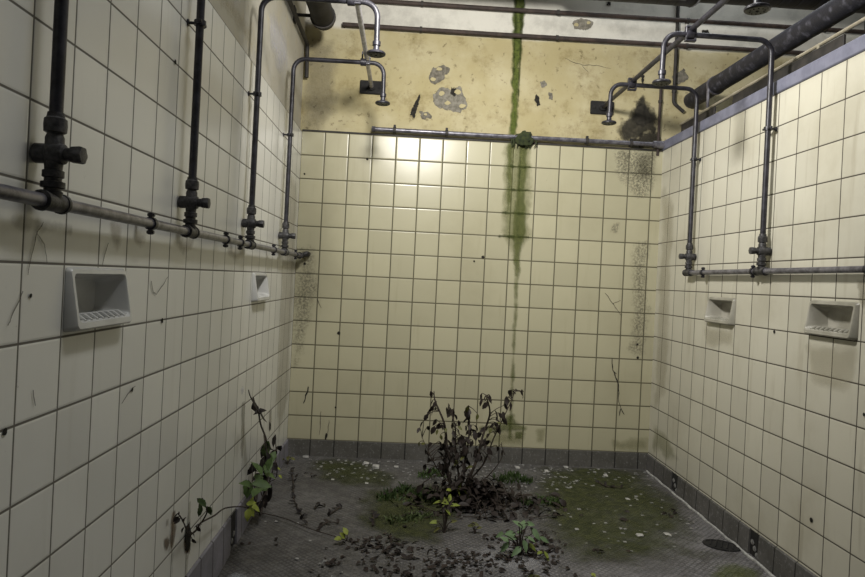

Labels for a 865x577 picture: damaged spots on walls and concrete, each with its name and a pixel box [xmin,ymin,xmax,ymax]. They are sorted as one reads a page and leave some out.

flaking render [410,65,467,120]
water stain [619,96,658,147]